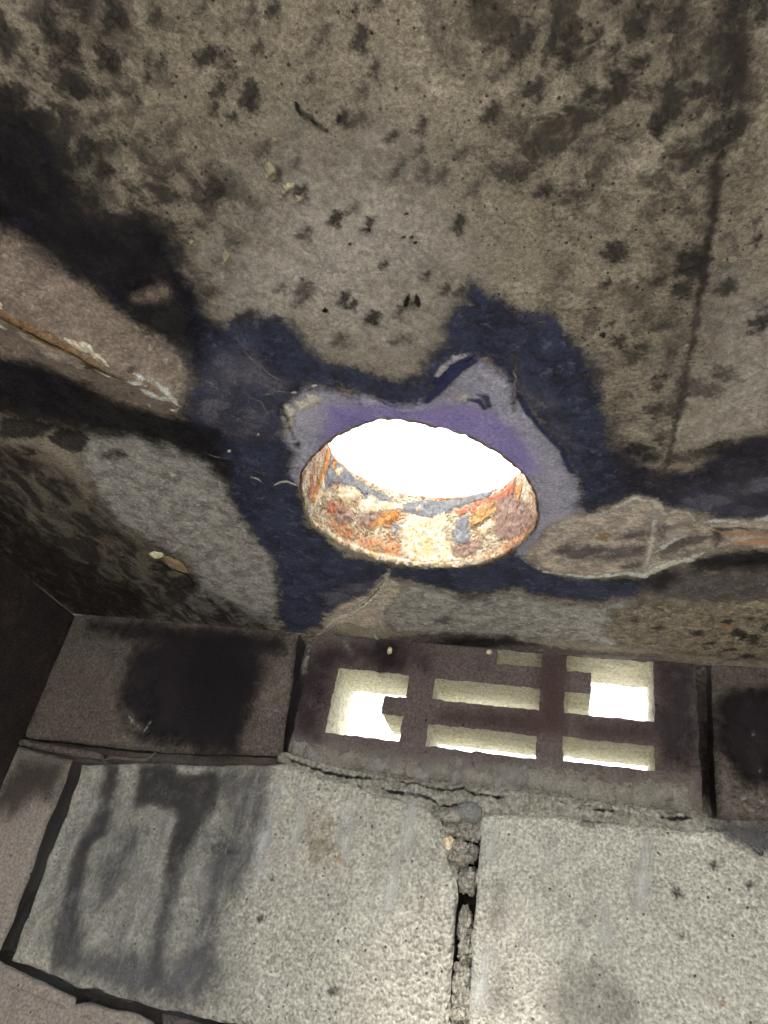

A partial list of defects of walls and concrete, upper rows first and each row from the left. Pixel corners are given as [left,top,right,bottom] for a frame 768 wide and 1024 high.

damp [0,0,238,253]
damp [467,0,768,200]
damp [201,115,466,359]
damp [0,417,279,755]
corrosion [308,448,338,503]
corrosion [325,500,400,557]
corrosion [449,476,534,561]
damp [382,586,634,647]
damp [279,361,768,603]
damp [51,765,272,1000]
crack [288,758,503,808]
crack [661,814,692,822]